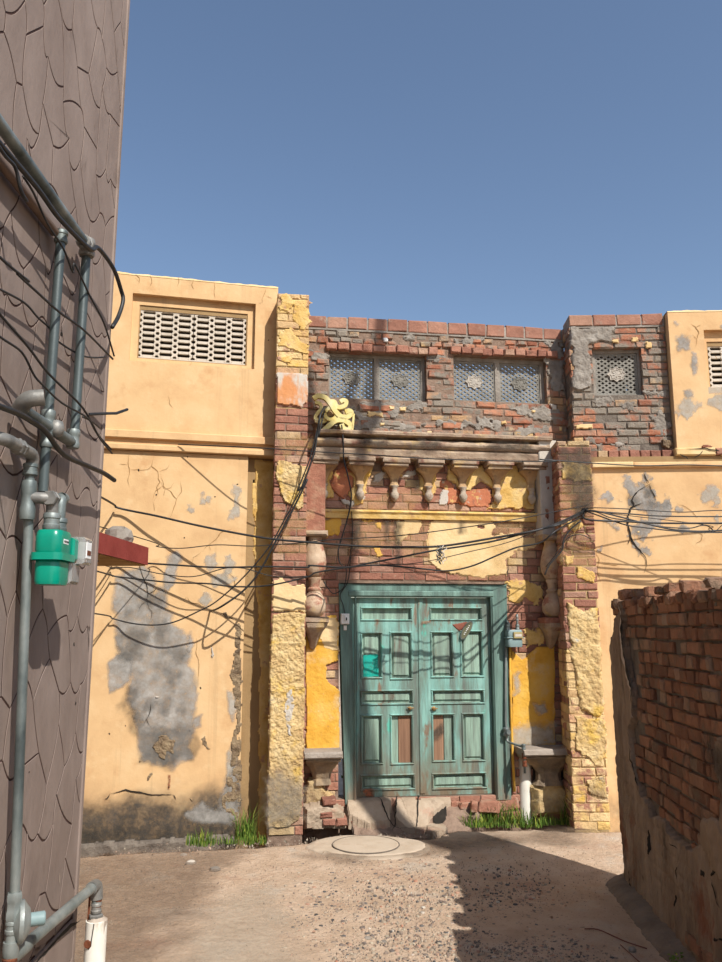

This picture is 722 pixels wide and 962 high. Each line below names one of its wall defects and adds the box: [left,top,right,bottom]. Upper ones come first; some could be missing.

peeling [677,336,697,374]
peeling [678,387,722,420]
crack [128,455,182,517]
peeling [623,472,684,556]
peeling [701,486,721,522]
water stain [108,551,200,767]
flaking render [143,460,317,857]
spalling [514,602,611,830]
flaking render [613,599,722,849]